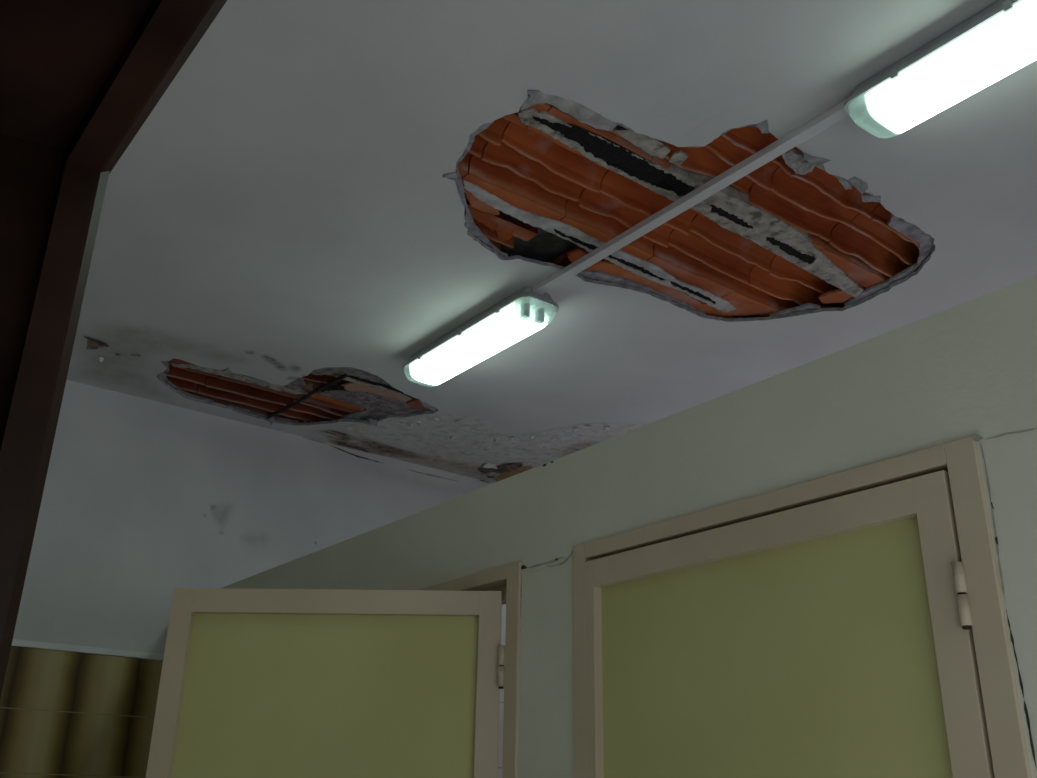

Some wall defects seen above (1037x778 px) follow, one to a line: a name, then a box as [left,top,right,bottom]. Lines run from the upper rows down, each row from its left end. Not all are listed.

spalling [443,89,935,319]
flaking render [157,358,645,483]